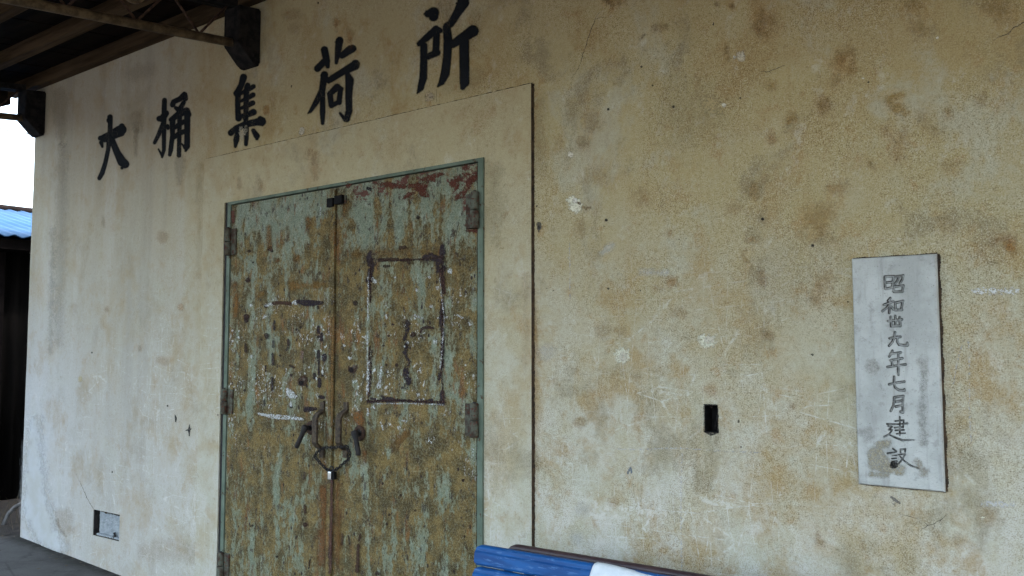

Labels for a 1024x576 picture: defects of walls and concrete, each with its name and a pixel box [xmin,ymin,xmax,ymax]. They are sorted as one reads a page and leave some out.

peeling [346,164,478,201]
spalling [566,195,583,214]
rust [302,480,361,574]